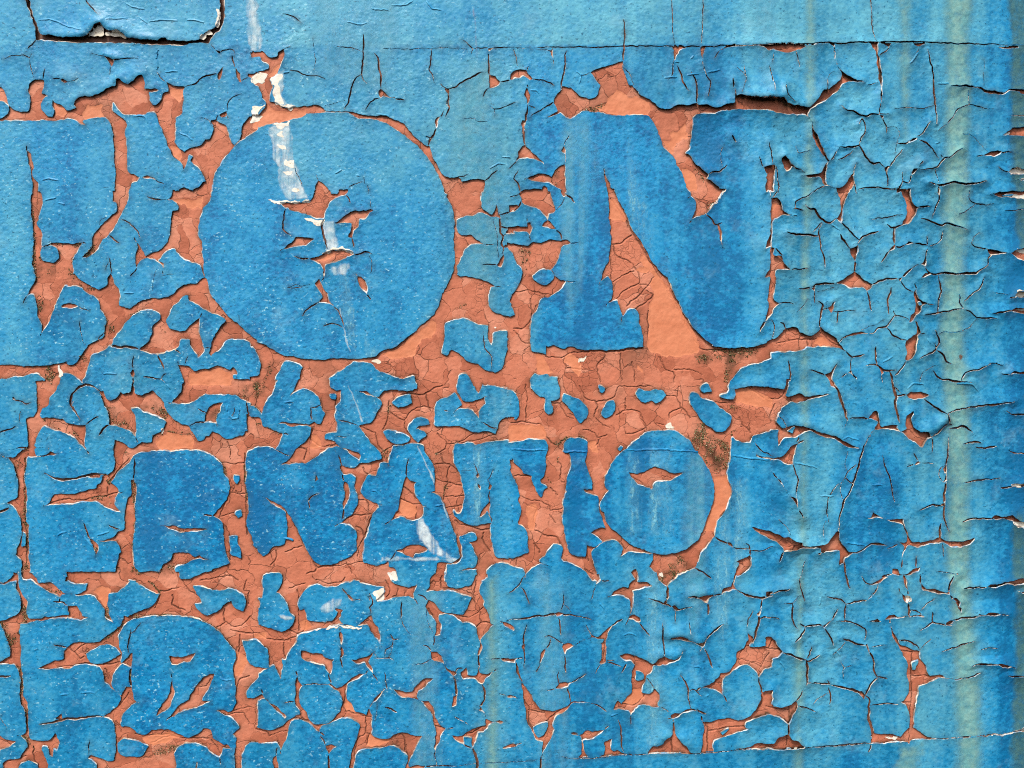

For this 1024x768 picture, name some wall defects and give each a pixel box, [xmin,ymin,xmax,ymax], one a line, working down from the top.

crack [5,0,235,77]
peeling [958,84,1024,95]
peeling [1003,115,1024,136]
peeling [969,134,1024,211]
crack [285,0,1024,425]
peeling [992,289,1024,314]
peeling [0,46,865,768]
peeling [847,284,1015,467]
peeling [963,515,1024,528]
crack [426,436,1024,767]
peeling [864,513,1014,729]
peeling [967,578,1024,594]